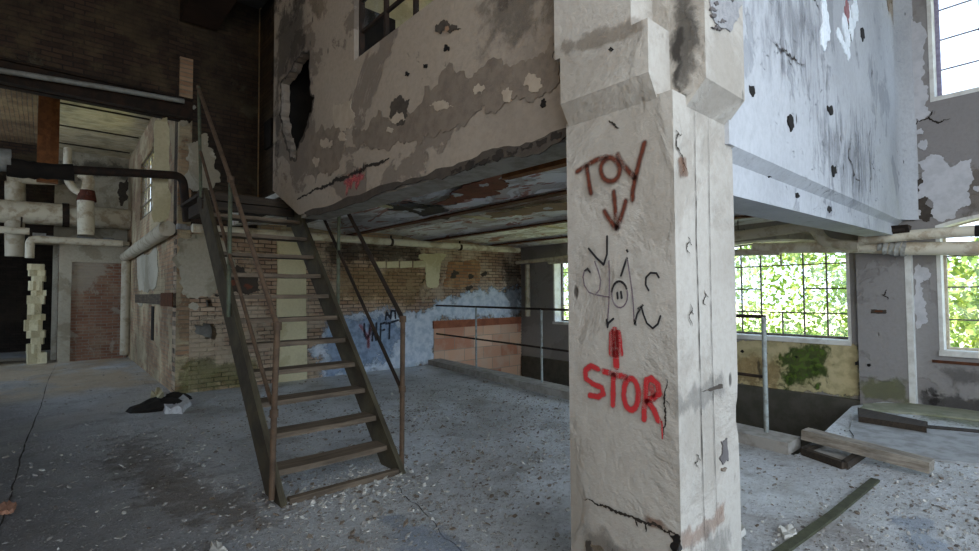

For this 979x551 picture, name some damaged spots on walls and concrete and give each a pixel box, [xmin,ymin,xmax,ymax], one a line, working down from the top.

crack [297,158,389,200]
peeling [279,35,560,183]
spalling [304,128,567,220]
peeling [910,15,979,222]
crack [0,368,55,526]
crack [585,499,680,538]
crack [662,381,670,435]
crack [676,130,718,551]